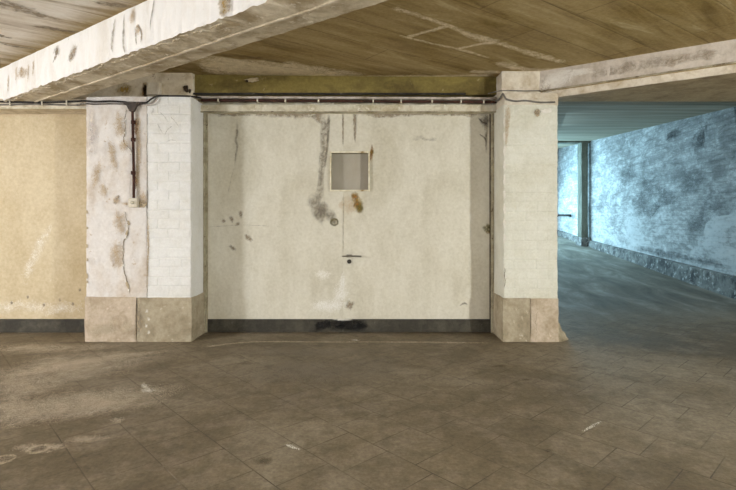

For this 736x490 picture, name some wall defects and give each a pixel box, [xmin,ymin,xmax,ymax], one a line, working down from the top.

damp [0,2,50,18]
damp [97,2,142,51]
damp [91,137,117,195]
damp [257,114,330,190]
damp [311,197,338,226]
rust [338,194,362,215]